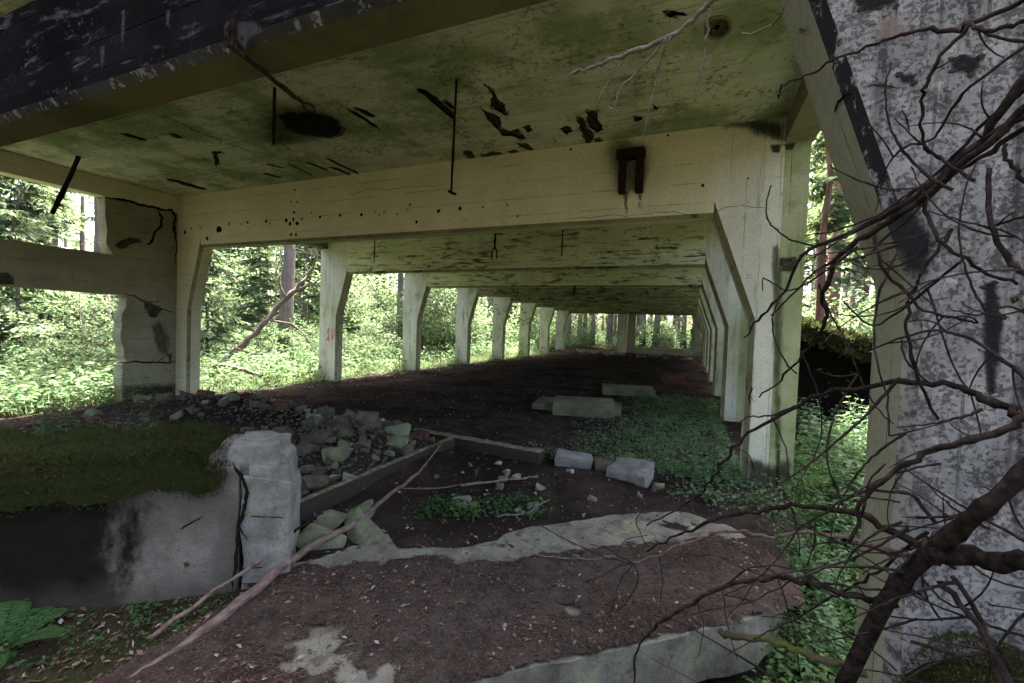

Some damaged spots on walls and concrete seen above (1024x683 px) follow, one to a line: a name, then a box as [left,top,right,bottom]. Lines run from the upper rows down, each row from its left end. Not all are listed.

spalling [417,88,454,117]
spalling [462,83,534,159]
spalling [562,109,603,143]
crack [106,197,178,263]
crack [117,355,175,364]
water stain [153,323,172,362]
crack [231,462,285,591]